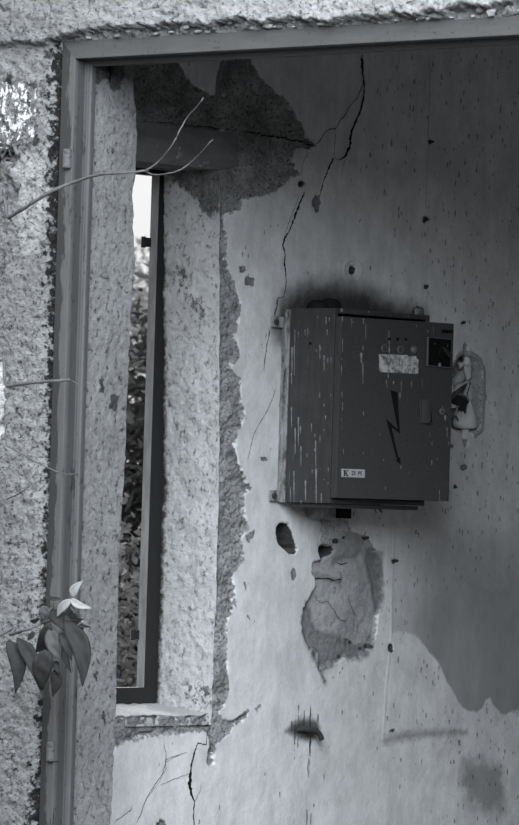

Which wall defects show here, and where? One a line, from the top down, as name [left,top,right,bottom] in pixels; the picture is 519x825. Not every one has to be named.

spalling [96,65,125,91]
crack [144,55,365,364]
damp [33,40,65,608]
spalling [99,59,315,766]
spalling [301,531,383,683]
damp [424,583,519,713]
damp [23,693,43,825]
crack [114,720,208,825]